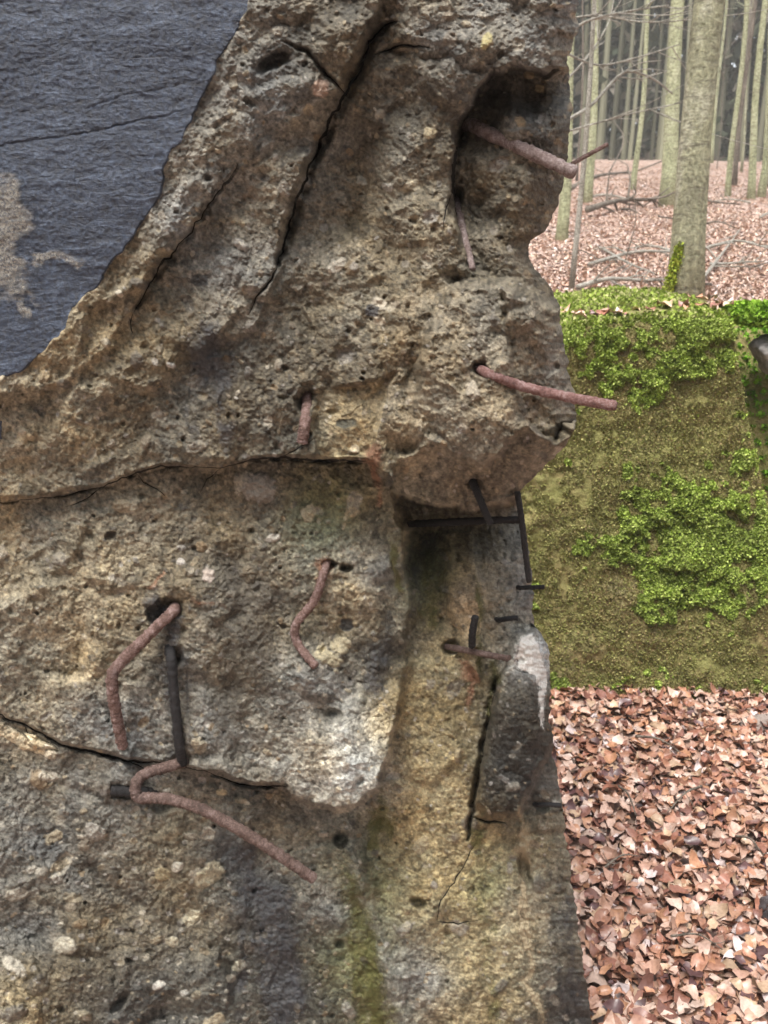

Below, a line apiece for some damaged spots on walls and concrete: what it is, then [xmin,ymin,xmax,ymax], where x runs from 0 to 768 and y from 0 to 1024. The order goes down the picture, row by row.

crack [130,164,238,333]
crack [250,22,429,312]
spalling [455,73,609,271]
crack [0,438,366,507]
spalling [407,479,545,675]
crack [0,714,286,788]
crack [437,685,505,925]